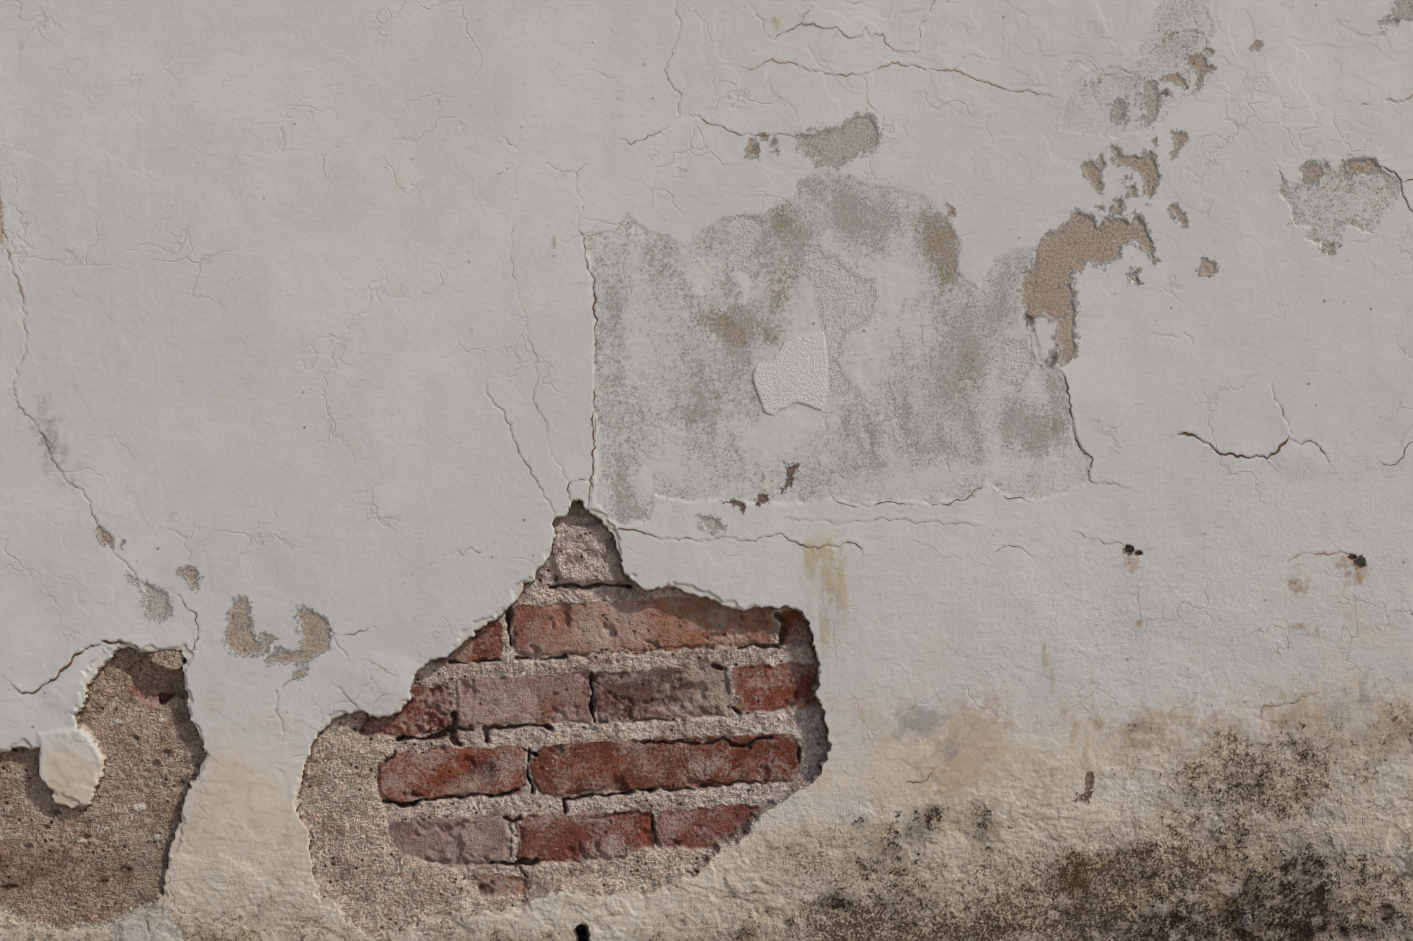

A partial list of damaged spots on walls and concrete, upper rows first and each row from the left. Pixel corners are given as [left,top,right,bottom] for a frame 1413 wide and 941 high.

crack [749,0,1039,102]
peeling [1380,0,1413,32]
crack [621,53,798,145]
flaking render [1281,154,1395,256]
crack [1178,397,1325,459]
flaking render [296,36,1220,939]
flaking render [222,594,334,681]
flaking render [0,647,207,941]
water stain [814,889,854,912]
water stain [864,805,948,880]
water stain [972,807,1011,852]
water stain [1047,823,1413,941]